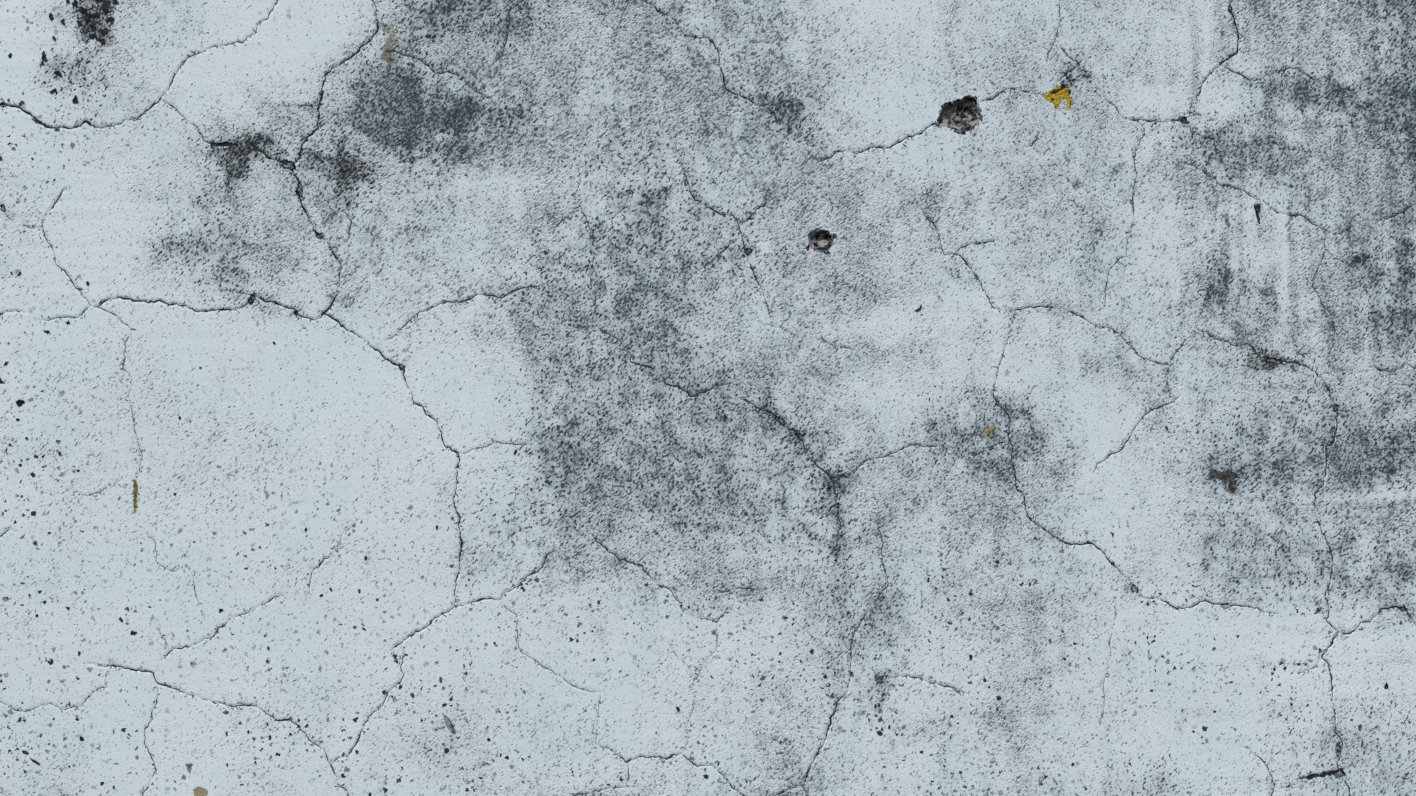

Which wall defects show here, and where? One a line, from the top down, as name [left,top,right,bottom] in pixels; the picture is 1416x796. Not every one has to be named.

leakage [147,0,550,308]
crack [0,0,964,796]
leakage [437,112,944,712]
leakage [735,79,823,155]
spalling [806,228,837,254]
spalling [935,95,983,134]
leakage [896,379,1072,505]
crack [554,1,1416,796]
leakage [1151,0,1416,618]